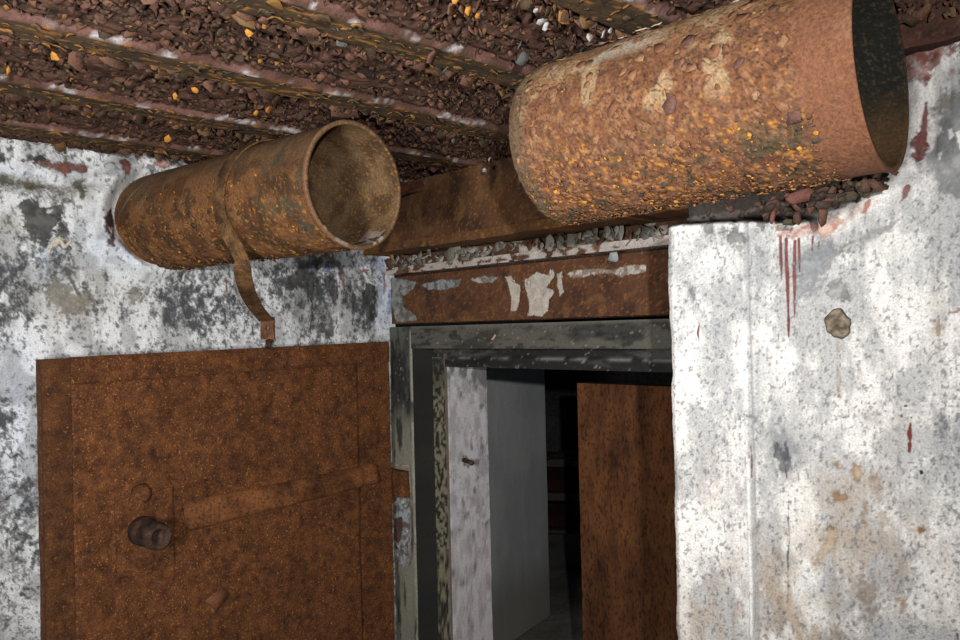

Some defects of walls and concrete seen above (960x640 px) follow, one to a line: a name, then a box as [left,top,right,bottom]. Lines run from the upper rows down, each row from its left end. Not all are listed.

corrosion [894,0,960,27]
corrosion [0,0,641,184]
corrosion [910,103,929,162]
water stain [0,174,86,199]
water stain [44,267,94,316]
water stain [126,286,144,304]
water stain [283,266,377,338]
peeling [384,224,664,322]
corrosion [706,171,899,337]
water stain [0,493,23,517]